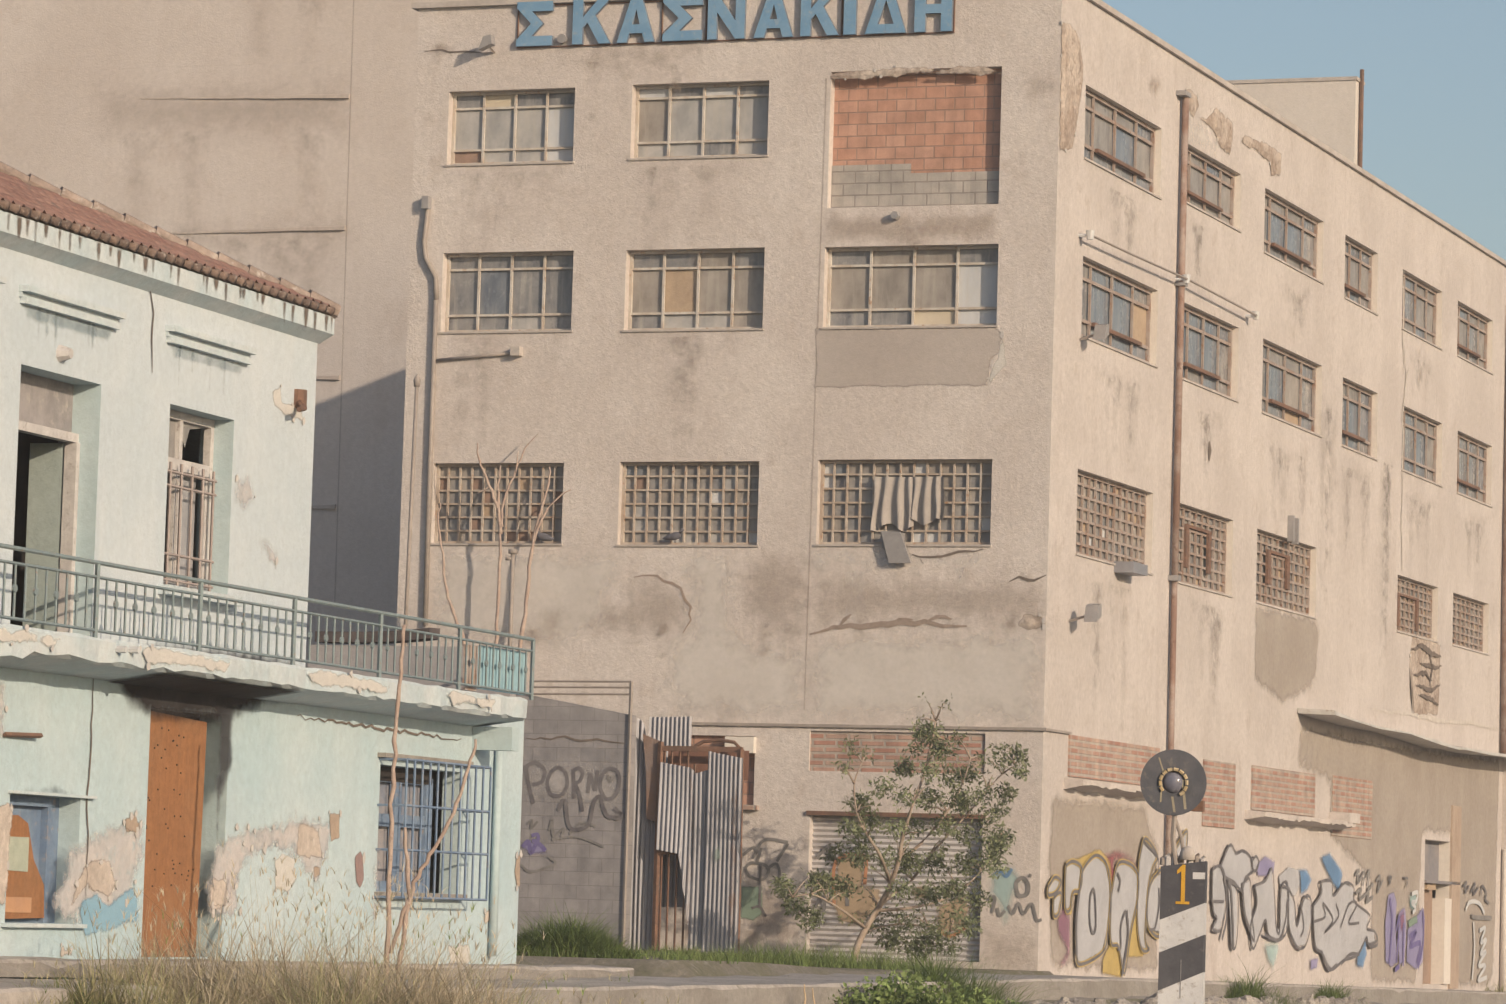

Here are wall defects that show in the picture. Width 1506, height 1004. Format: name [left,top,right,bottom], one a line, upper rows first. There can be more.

spalling [830,65,1005,80]
flaking render [1186,88,1281,176]
crack [634,574,692,633]
crack [810,614,967,635]
flaking render [140,644,230,672]
crack [297,714,462,741]
flaking render [0,803,13,904]
flaking render [56,810,143,922]
flaking render [209,810,342,921]